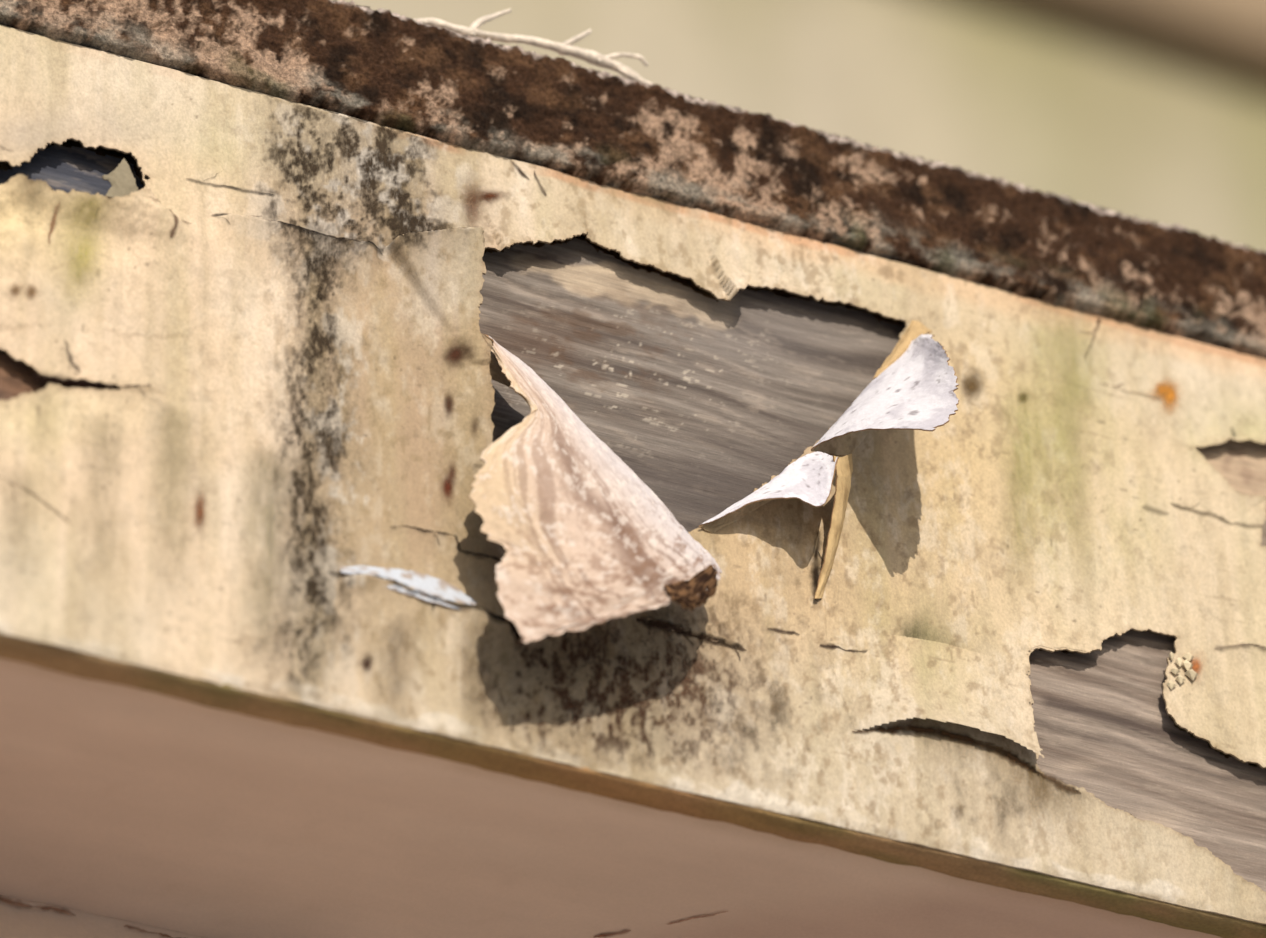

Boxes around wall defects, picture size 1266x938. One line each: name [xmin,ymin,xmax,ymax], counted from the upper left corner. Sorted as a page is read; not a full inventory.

peeling [0,144,144,199]
crack [171,177,384,254]
peeling [0,354,119,401]
leakage [270,105,449,682]
corrosion [1157,385,1176,405]
peeling [469,238,959,644]
peeling [1196,440,1266,546]
crack [813,533,824,600]
crack [329,572,523,639]
crack [636,617,747,659]
leakage [494,618,736,755]
peeling [1028,629,1266,892]